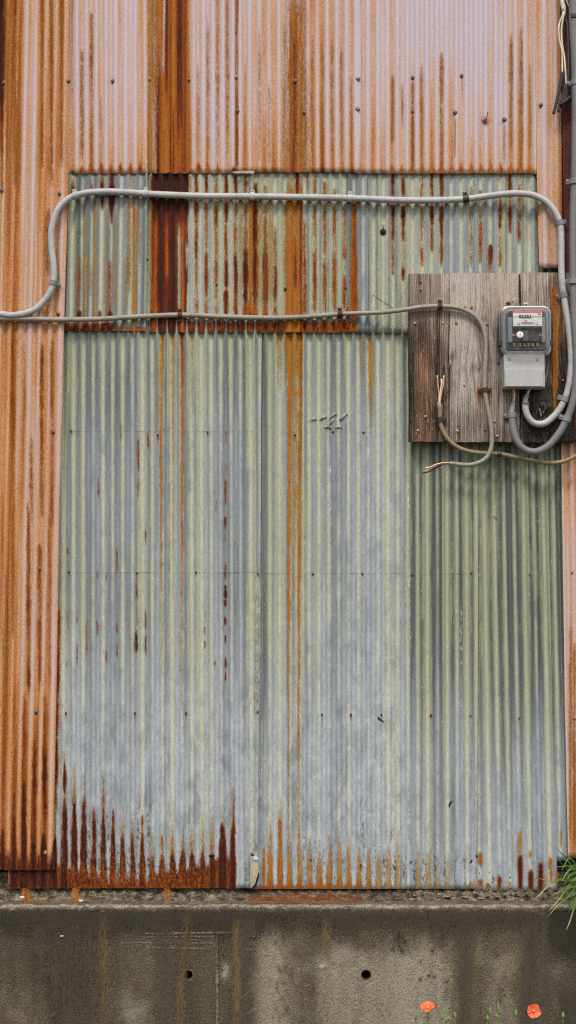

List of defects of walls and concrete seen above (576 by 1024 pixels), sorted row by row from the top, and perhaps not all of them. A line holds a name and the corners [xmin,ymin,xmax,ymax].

rust [0,0,21,188]
rust [40,0,63,180]
rust [390,30,532,281]
rust [64,0,401,903]
rust [0,329,237,903]
rust [560,628,576,843]
rust [416,854,450,888]
rust [469,830,558,890]